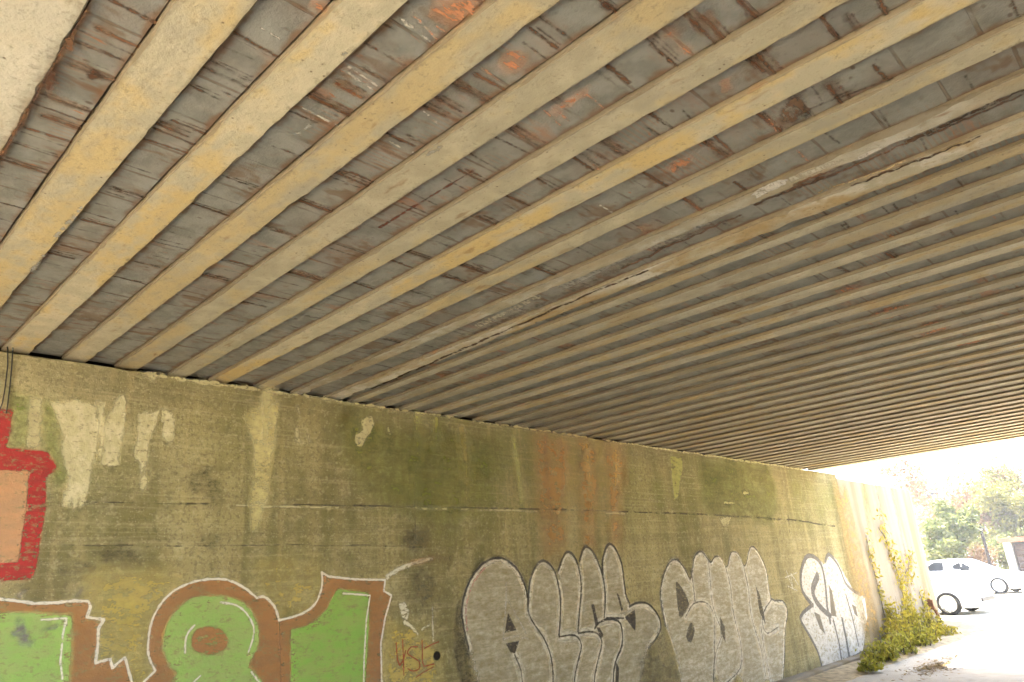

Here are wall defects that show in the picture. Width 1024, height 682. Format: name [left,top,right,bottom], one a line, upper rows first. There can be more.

crack [754,89,1024,206]
crack [371,270,648,389]
peeling [27,396,126,508]
peeling [134,410,175,489]
peeling [322,397,453,446]
crack [236,504,835,532]